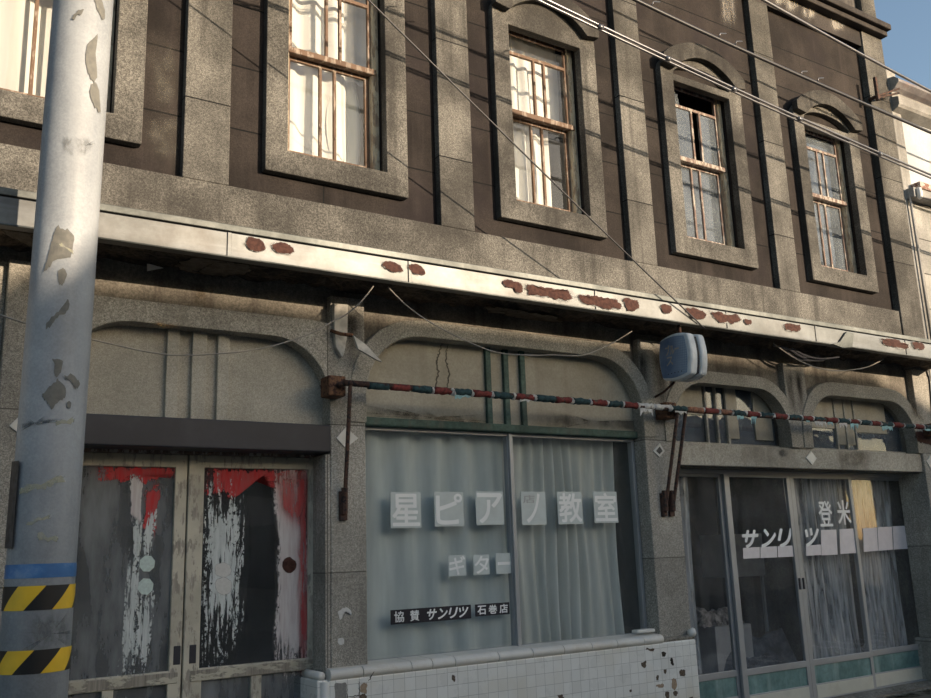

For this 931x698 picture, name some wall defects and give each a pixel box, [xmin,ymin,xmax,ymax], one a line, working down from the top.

peeling [86,34,101,113]
peeling [43,225,74,285]
rust [246,237,294,254]
rust [383,261,425,275]
rust [503,279,639,311]
rust [687,307,752,325]
rust [881,338,925,350]
crack [435,345,450,388]
peeling [98,466,175,676]
peeling [201,468,308,667]
spalling [334,672,374,698]
spalling [646,648,685,698]